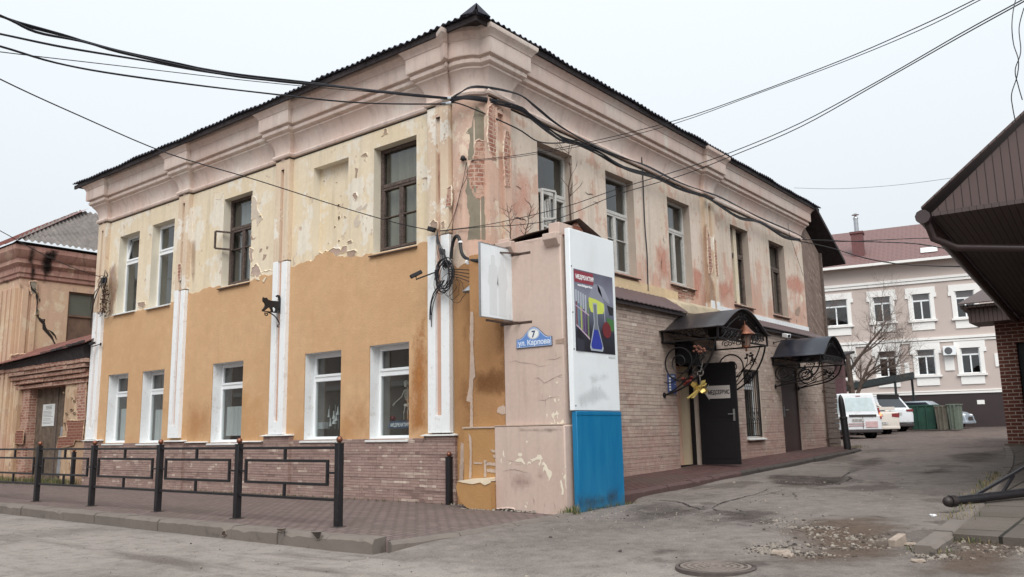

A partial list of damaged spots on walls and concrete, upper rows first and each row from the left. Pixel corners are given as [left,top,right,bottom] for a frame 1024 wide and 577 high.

flaking render [430,103,512,240]
flaking render [249,196,273,282]
spalling [310,192,367,261]
peeling [474,441,567,495]